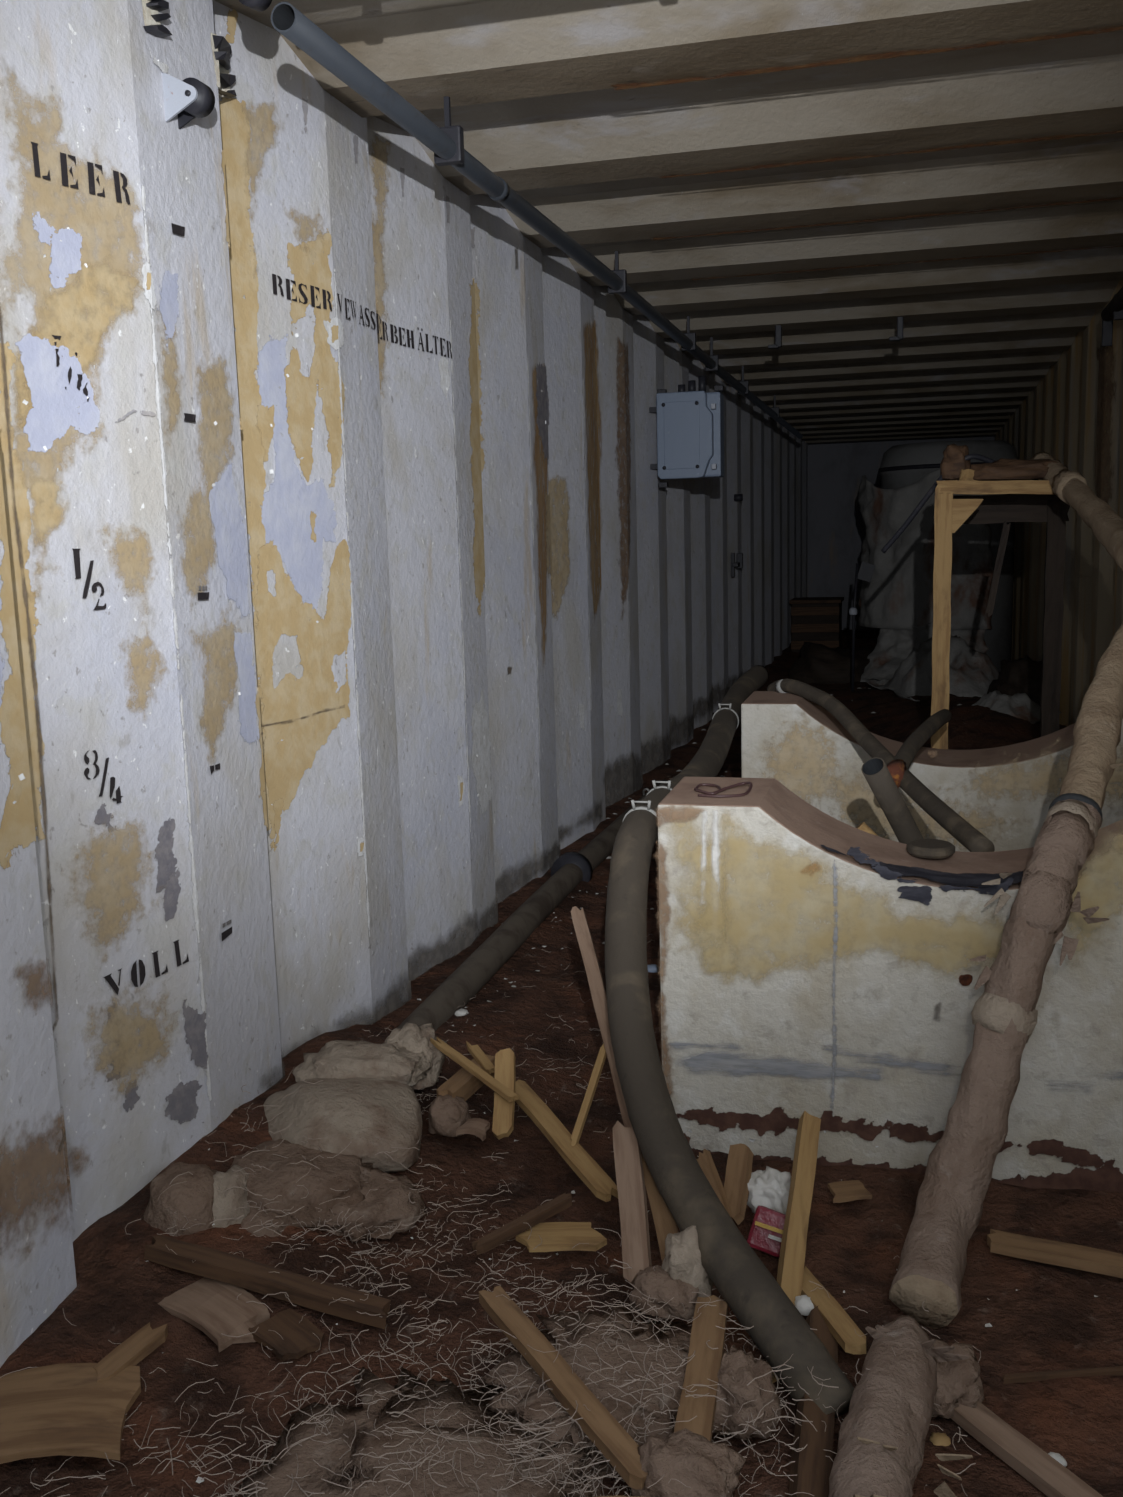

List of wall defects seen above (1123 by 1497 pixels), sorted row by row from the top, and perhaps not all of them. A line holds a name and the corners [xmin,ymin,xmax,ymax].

peeling [0,74,212,1101]
peeling [209,7,370,937]
leakage [468,279,486,616]
leakage [532,368,570,654]
leakage [584,324,631,616]
leakage [1095,345,1115,504]
leakage [675,811,1004,979]
leakage [1069,834,1123,951]
peeling [676,1107,799,1162]
peeling [816,1111,944,1175]
peeling [991,1139,1123,1193]